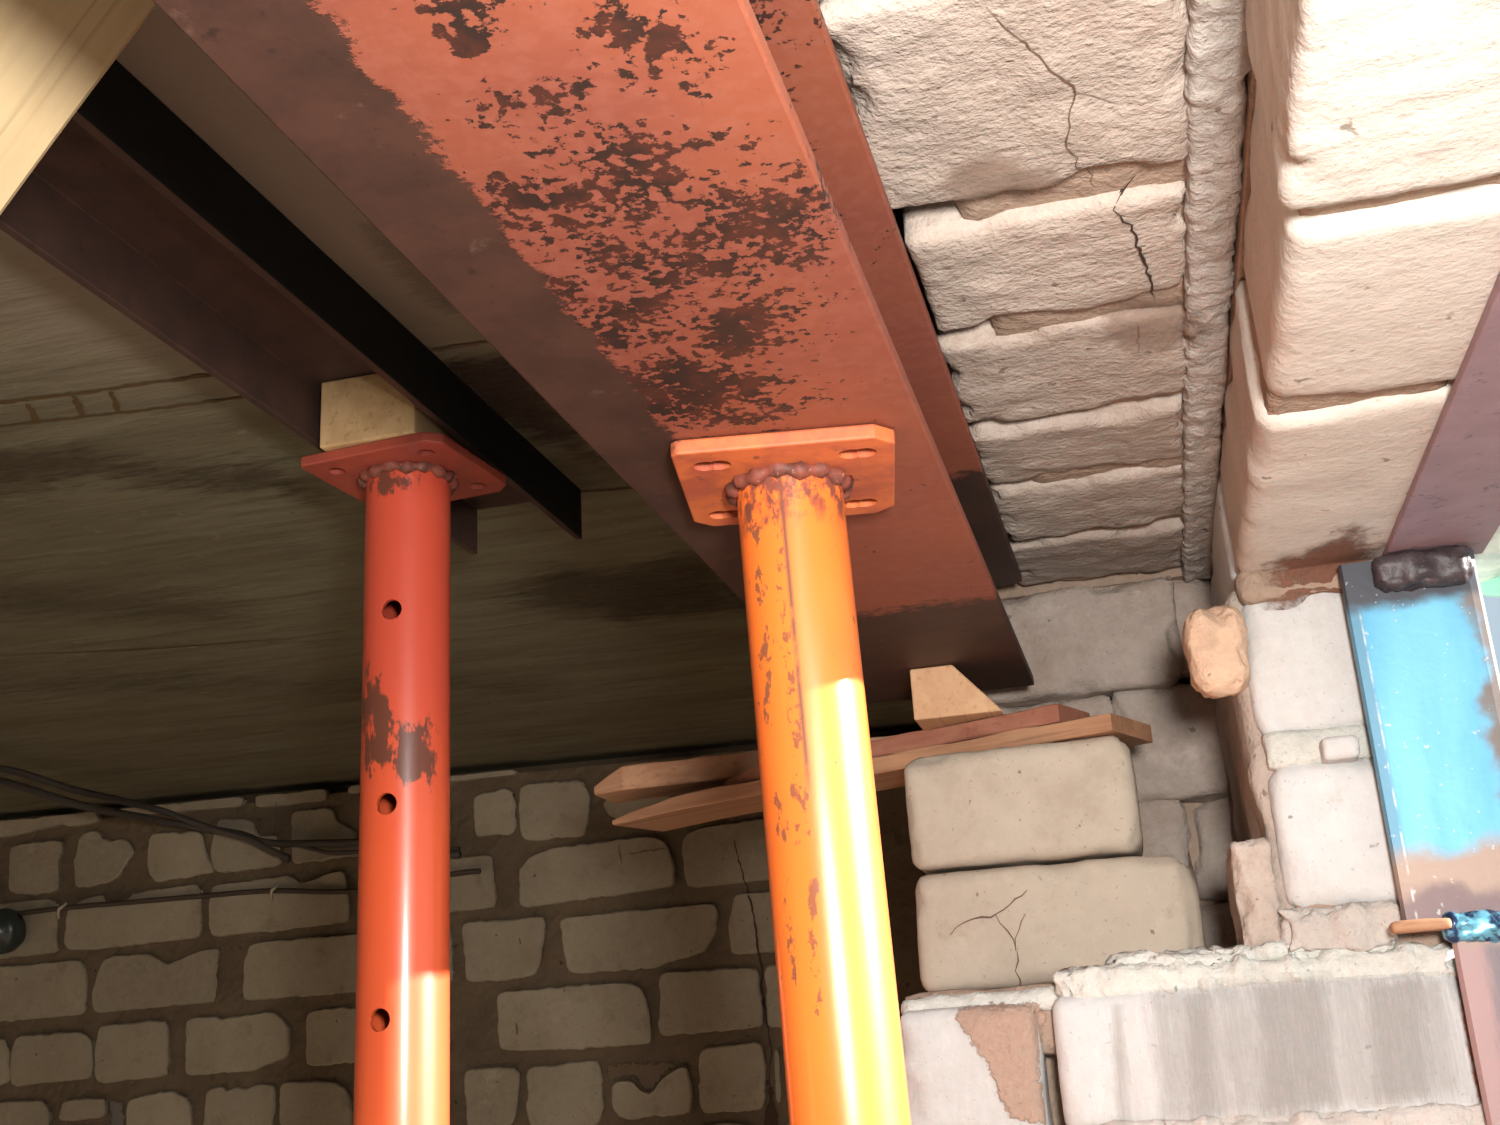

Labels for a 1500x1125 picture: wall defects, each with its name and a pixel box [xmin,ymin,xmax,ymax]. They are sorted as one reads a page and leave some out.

crack [986,7,1155,351]
crack [734,840,779,1125]
crack [950,890,1027,986]